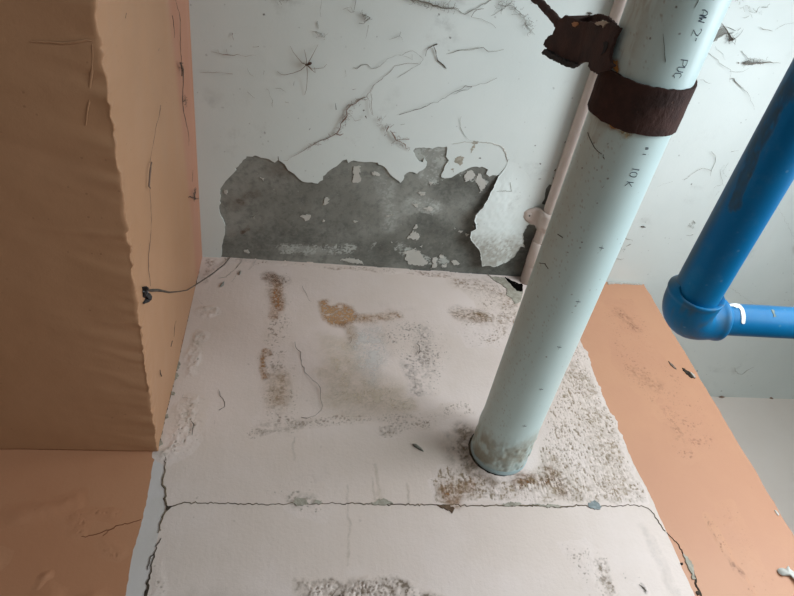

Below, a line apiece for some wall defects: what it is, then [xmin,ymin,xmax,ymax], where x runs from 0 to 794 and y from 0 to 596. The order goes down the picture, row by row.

rust [320,300,400,325]
spalling [197,141,552,441]
crack [81,340,702,596]